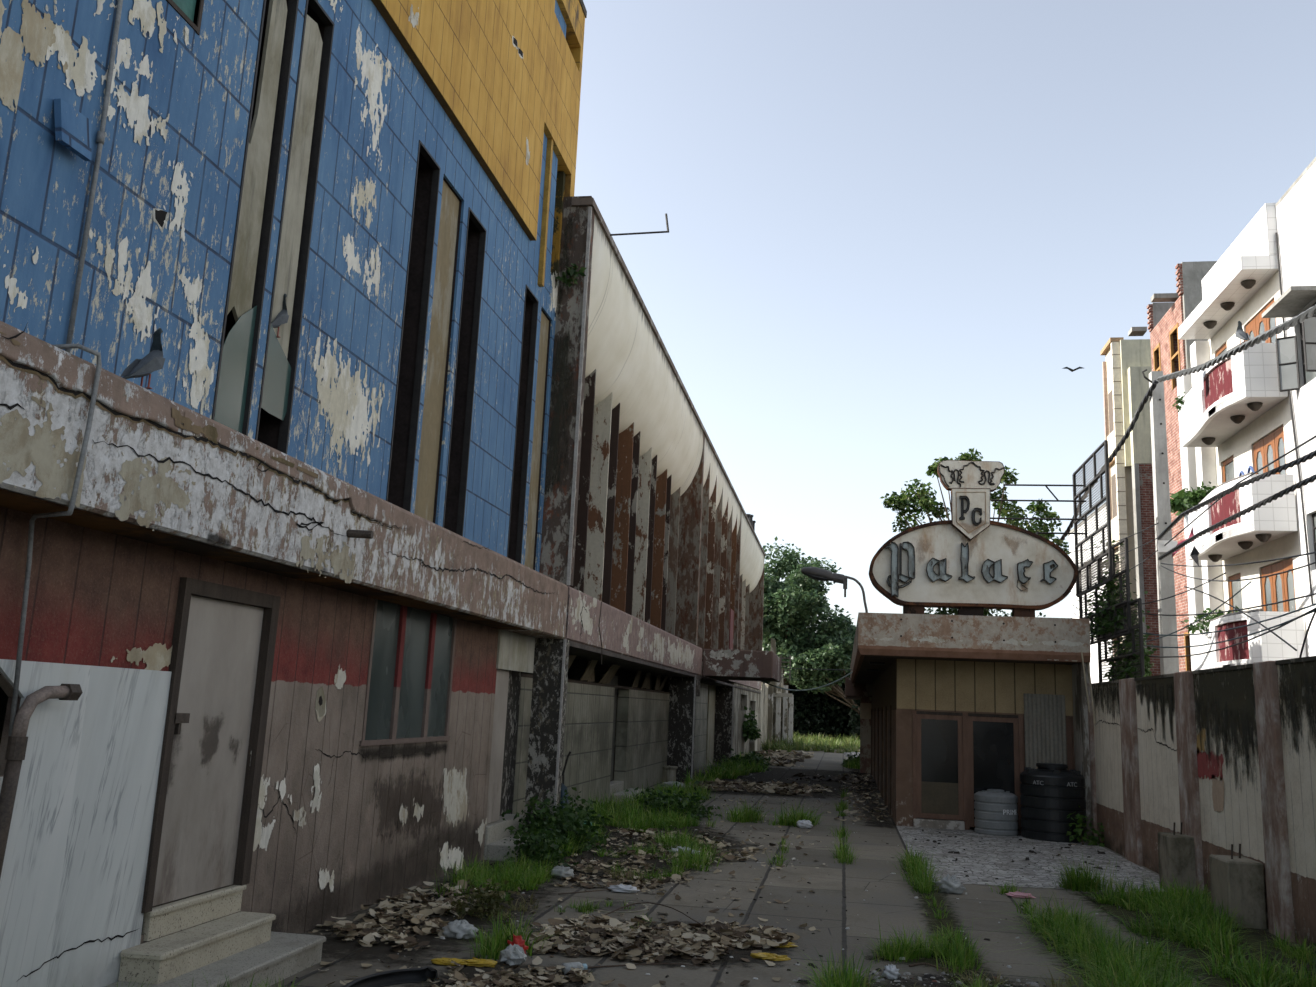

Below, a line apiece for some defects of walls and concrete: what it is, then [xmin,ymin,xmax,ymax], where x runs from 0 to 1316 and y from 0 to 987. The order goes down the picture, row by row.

peeling [0,0,193,242]
peeling [343,24,391,304]
peeling [302,314,385,467]
crack [0,322,587,635]
peeling [111,643,173,671]
leakage [1092,683,1120,717]
leakage [1136,676,1175,740]
leakage [1193,667,1258,789]
leakage [1277,660,1316,750]
peeling [253,762,322,851]
peeling [439,766,487,873]
crack [20,929,138,979]